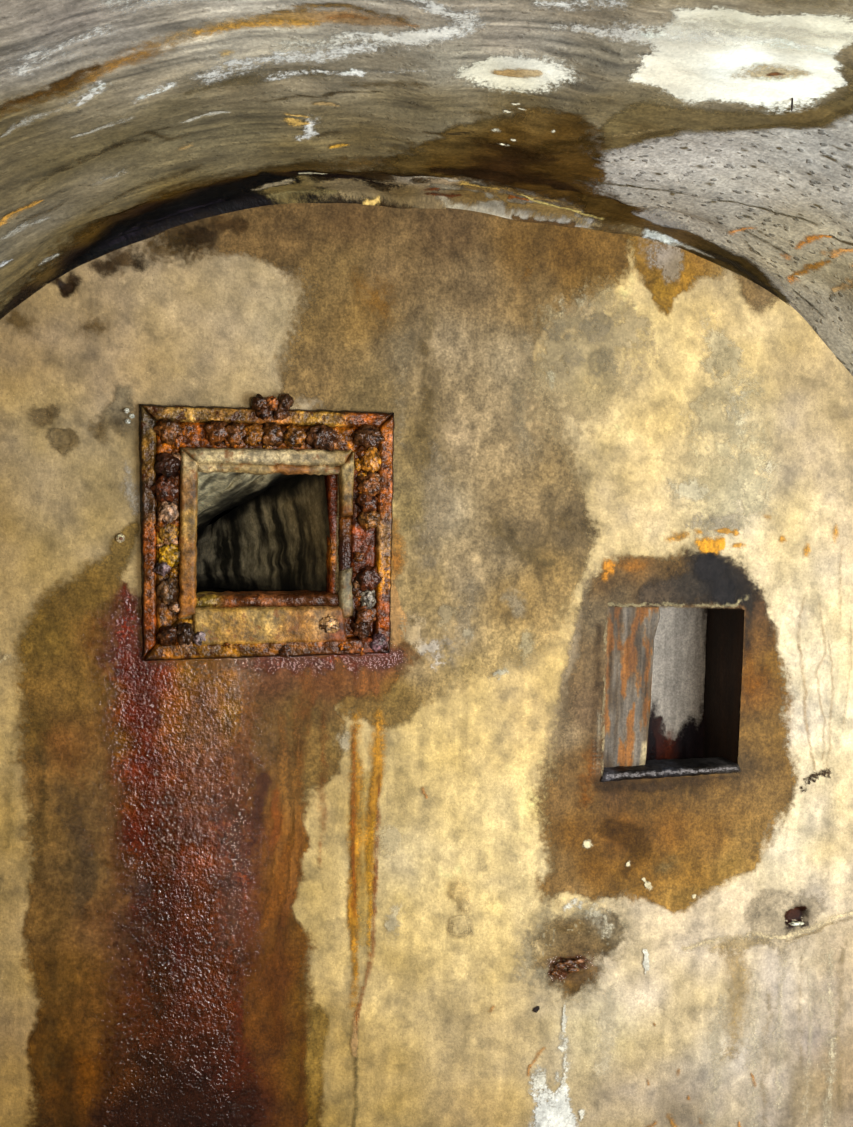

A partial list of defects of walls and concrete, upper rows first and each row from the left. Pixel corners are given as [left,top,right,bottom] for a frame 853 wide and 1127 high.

water stain [0,0,853,318]
water stain [8,311,28,327]
rust [782,235,853,281]
rust [603,559,645,581]
rust [669,528,743,554]
water stain [151,186,798,1127]
water stain [17,521,143,1127]
rust [93,520,407,1127]
spalling [514,903,628,1003]
spalling [712,889,824,1055]